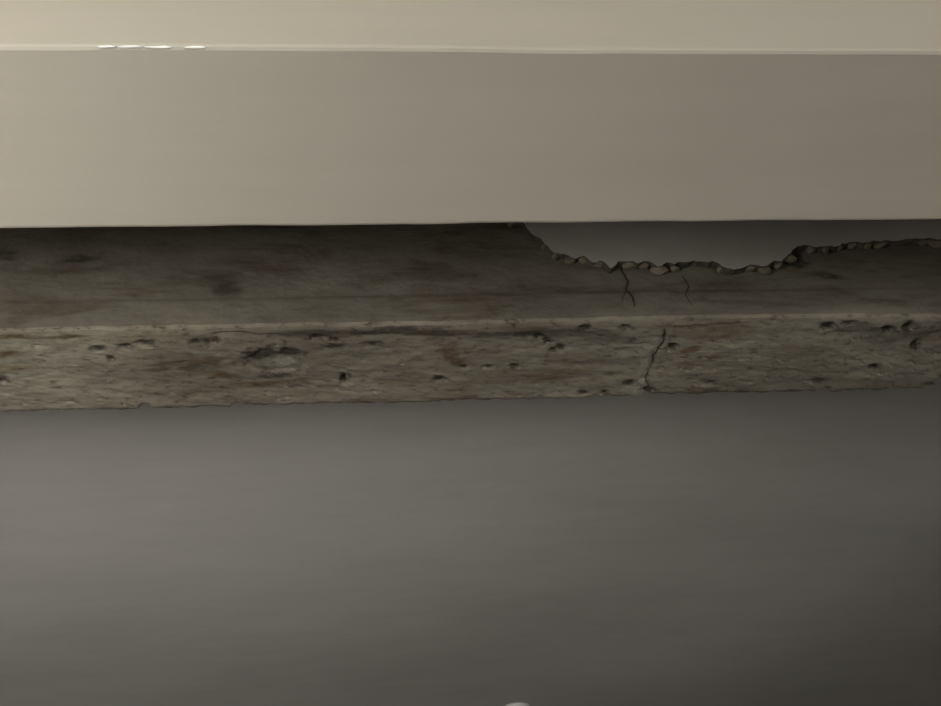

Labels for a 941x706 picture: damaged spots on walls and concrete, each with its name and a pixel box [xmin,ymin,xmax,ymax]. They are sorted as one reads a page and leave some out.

spalling [506,219,941,276]
crack [632,328,672,394]